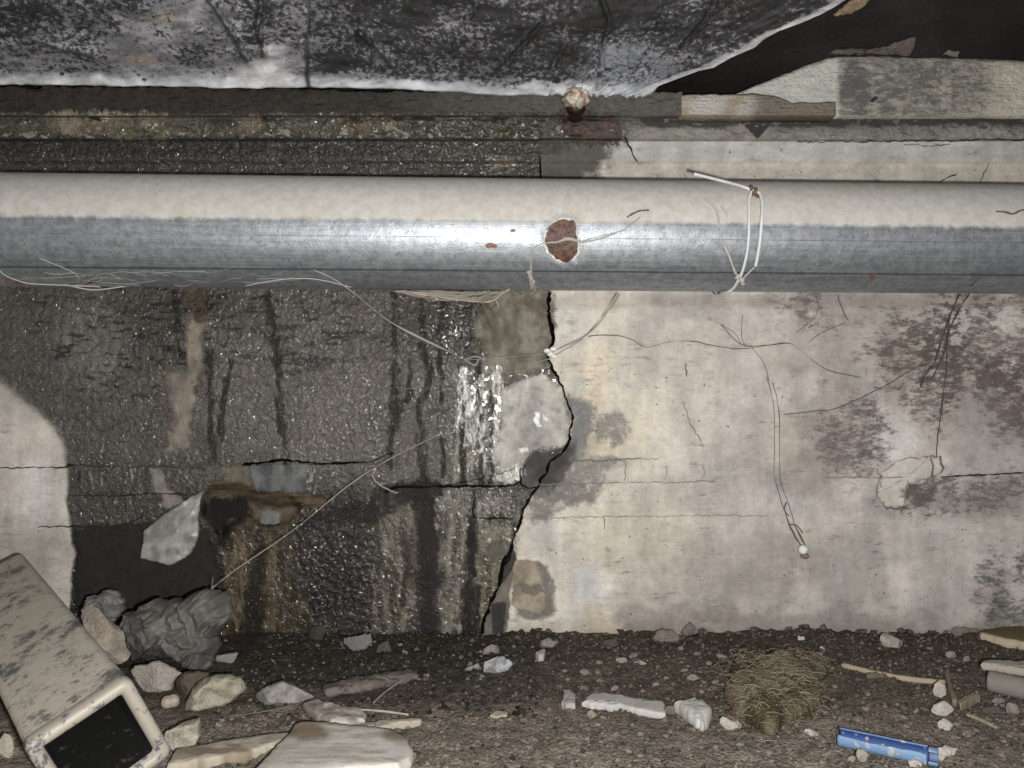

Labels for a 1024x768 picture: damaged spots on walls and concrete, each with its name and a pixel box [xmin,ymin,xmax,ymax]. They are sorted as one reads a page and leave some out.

rust [545,219,578,263]
damp [784,292,828,328]
damp [865,293,1024,446]
spalling [140,480,328,566]
damp [0,286,626,636]
crack [242,452,394,466]
crack [384,292,768,636]
damp [816,399,894,477]
damp [906,474,1021,514]
damp [975,556,1024,626]